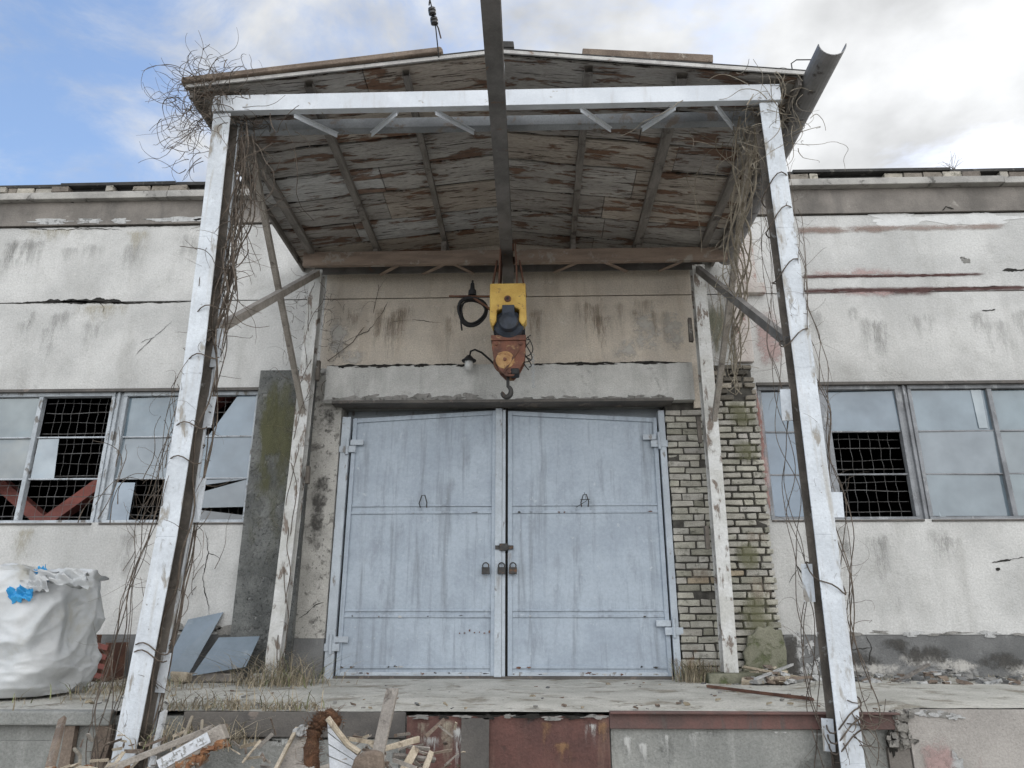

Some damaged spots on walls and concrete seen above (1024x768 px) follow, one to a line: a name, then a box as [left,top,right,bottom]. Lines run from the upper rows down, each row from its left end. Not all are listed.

peeling [867,212,1024,227]
corrosion [802,270,1024,295]
crack [12,297,189,356]
crack [535,359,690,367]
damp [262,388,295,463]
damp [311,477,327,536]
corrosion [406,715,611,768]